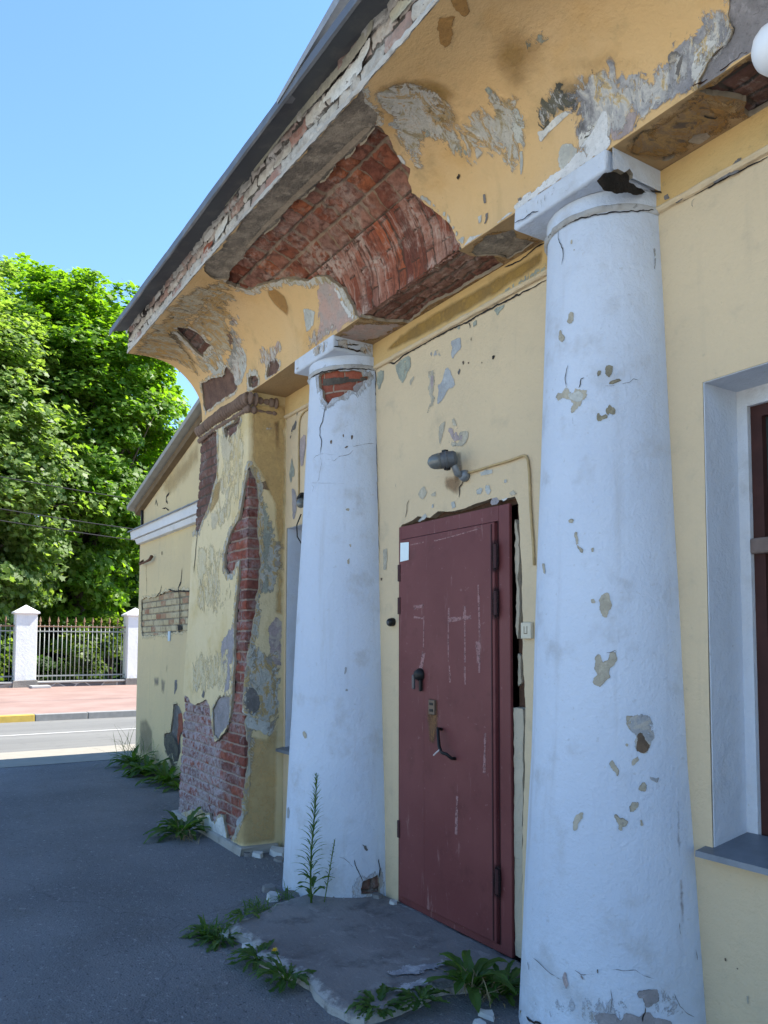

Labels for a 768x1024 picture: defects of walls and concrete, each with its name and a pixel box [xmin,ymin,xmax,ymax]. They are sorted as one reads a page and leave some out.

peeling [540,0,768,170]
spalling [597,172,683,203]
flaking render [133,83,546,415]
crack [548,209,654,261]
peeling [556,366,587,413]
peeling [597,405,615,421]
peeling [597,365,637,386]
crack [313,406,409,541]
flaking render [140,425,283,841]
peeling [593,650,617,687]
spalling [626,714,654,765]
peeling [555,989,694,1024]